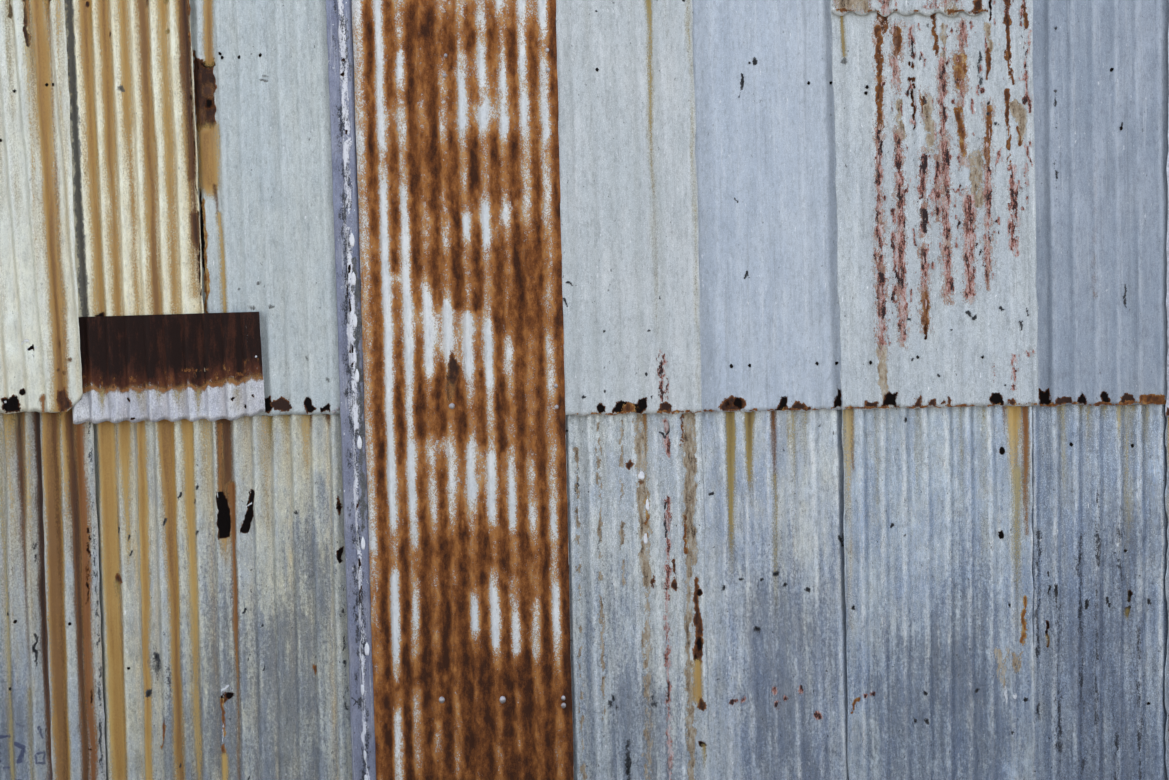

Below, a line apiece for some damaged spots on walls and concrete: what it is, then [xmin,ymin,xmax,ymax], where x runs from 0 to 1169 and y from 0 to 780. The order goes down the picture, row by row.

rust [833,0,988,16]
rust [920,92,936,154]
rust [986,0,1029,258]
rust [2,0,263,780]
rust [353,0,627,780]
rust [261,415,310,481]
rust [650,348,1169,582]
rust [1020,595,1028,646]
rust [772,685,804,709]